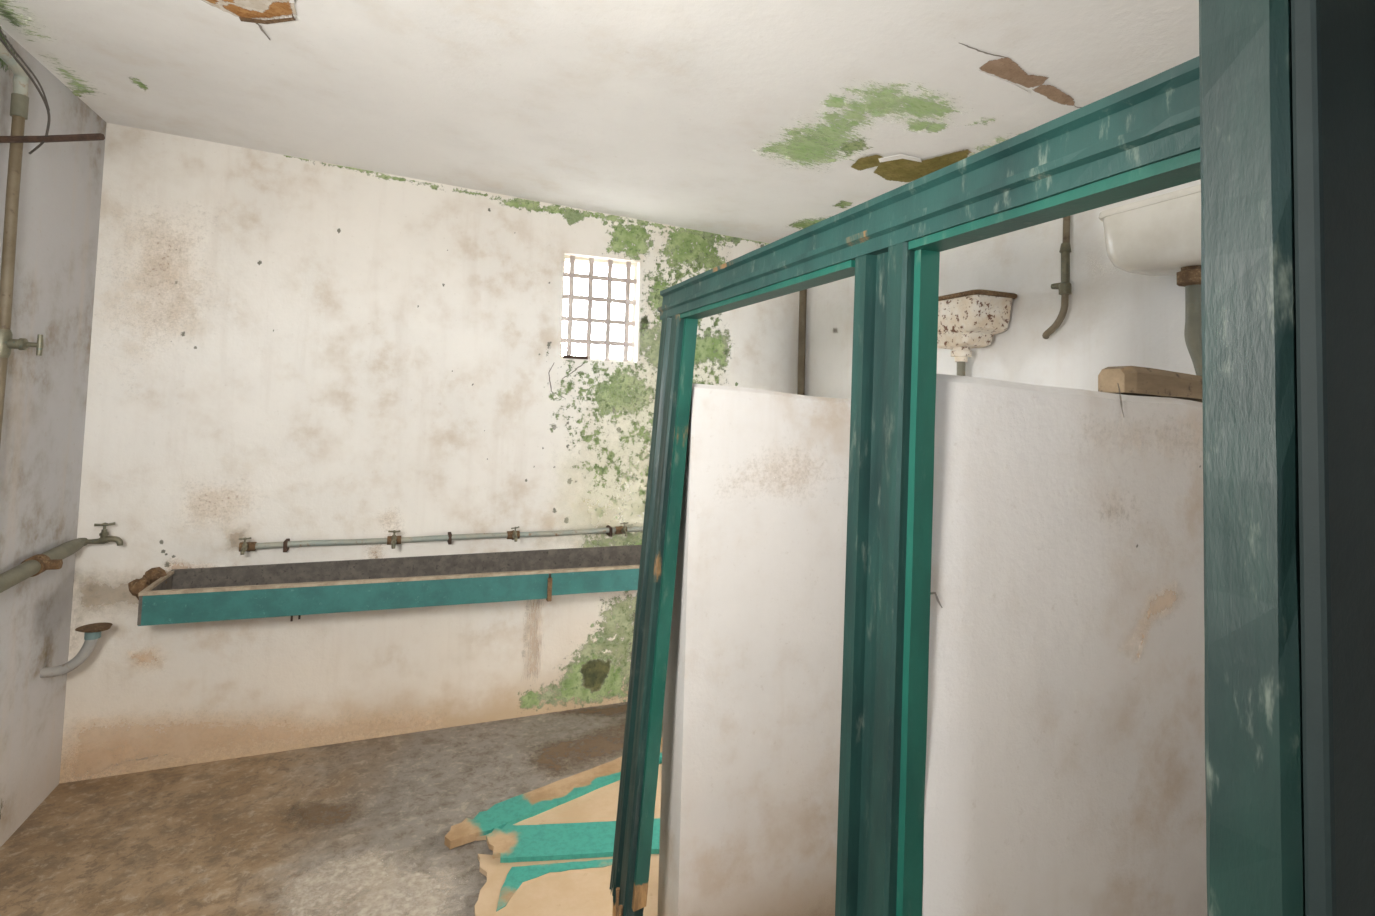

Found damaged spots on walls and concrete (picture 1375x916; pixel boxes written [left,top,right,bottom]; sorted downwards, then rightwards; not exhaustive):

spalling [203,0,296,24]
peeling [978,57,1075,106]
mould [761,83,995,172]
mould [790,200,852,229]
leakage [284,155,770,548]
leakage [518,591,637,777]